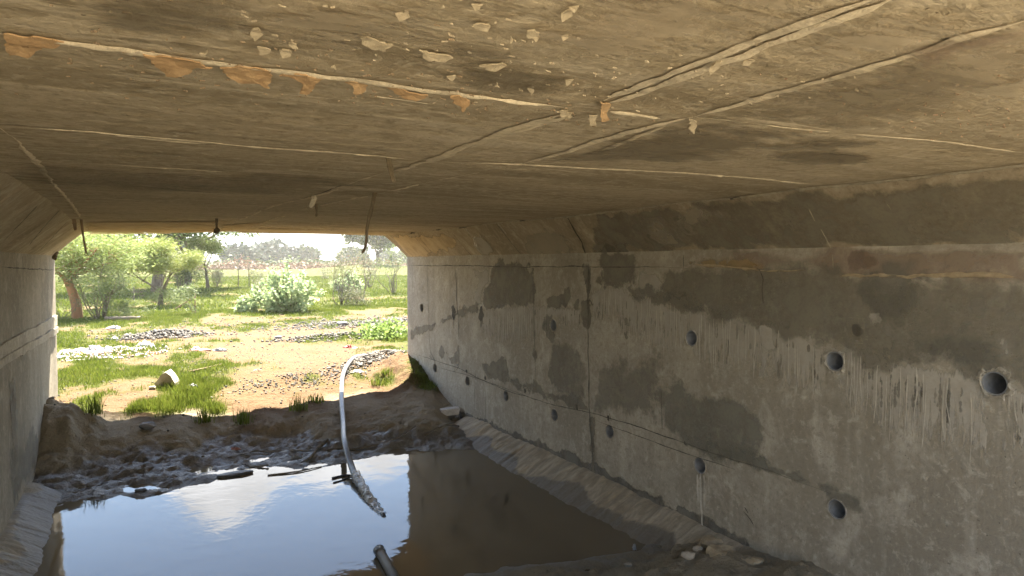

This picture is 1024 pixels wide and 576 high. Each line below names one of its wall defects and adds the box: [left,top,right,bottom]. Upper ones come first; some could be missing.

peeling [4,33,64,58]
peeling [118,0,640,138]
damp [411,181,1024,546]